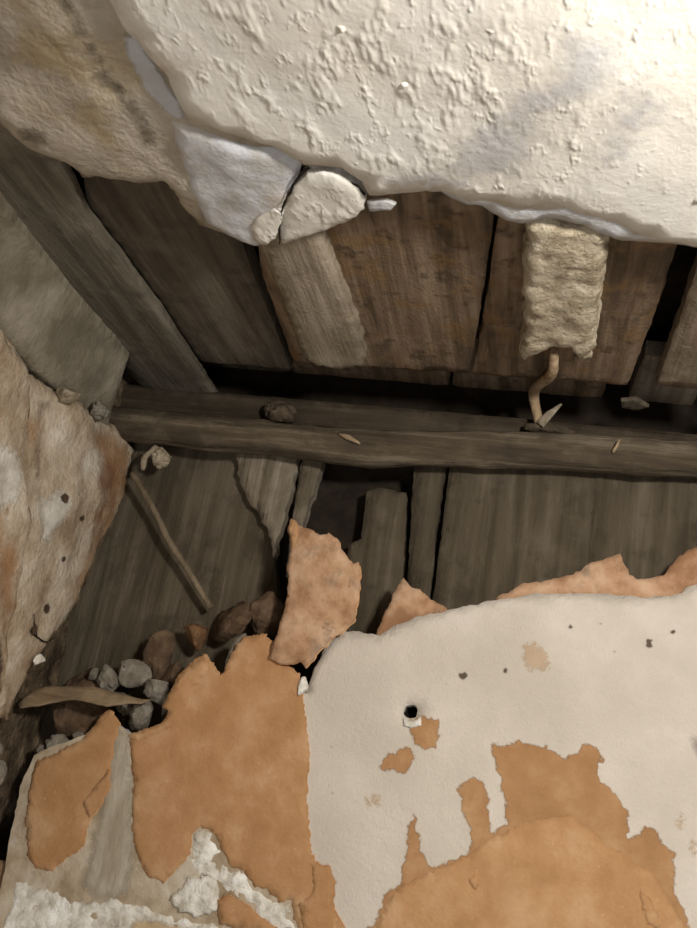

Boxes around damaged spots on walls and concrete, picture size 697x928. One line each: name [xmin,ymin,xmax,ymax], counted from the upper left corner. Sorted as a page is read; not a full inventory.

crack [278,166,310,244]
spalling [430,191,697,247]
peeling [496,547,697,600]
peeling [377,578,447,635]
peeling [0,519,362,928]
peeling [380,716,440,774]
peeling [367,740,690,928]